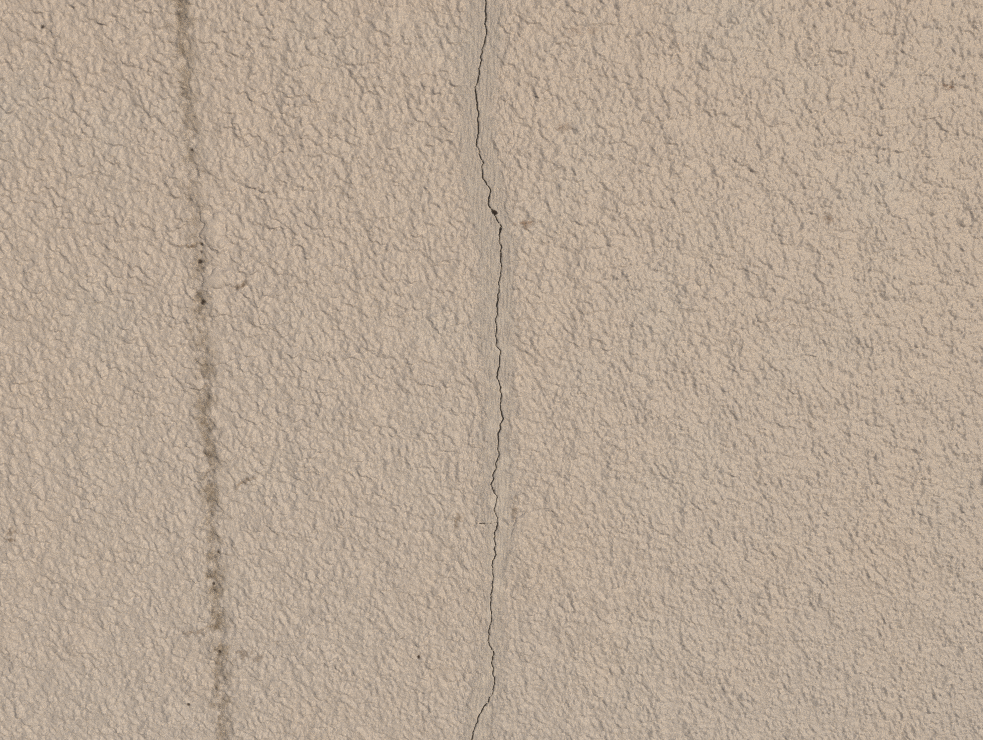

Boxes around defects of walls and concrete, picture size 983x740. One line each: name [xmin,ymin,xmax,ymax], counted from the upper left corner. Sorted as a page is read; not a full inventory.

crack [471,0,504,740]